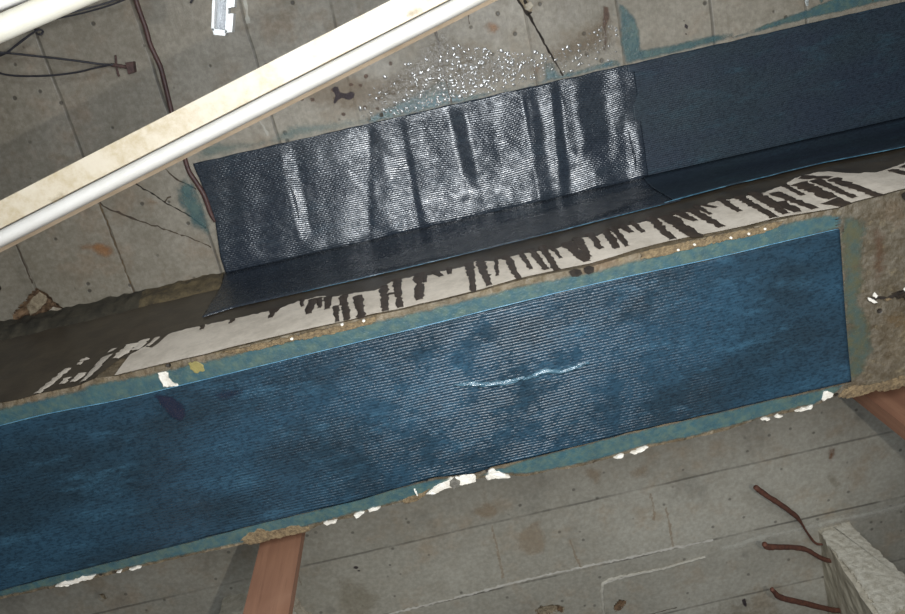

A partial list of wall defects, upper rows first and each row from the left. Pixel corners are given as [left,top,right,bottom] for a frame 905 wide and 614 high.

spalling [34,2,905,394]
crack [517,0,564,76]
leakage [358,6,732,122]
spalling [0,228,905,591]